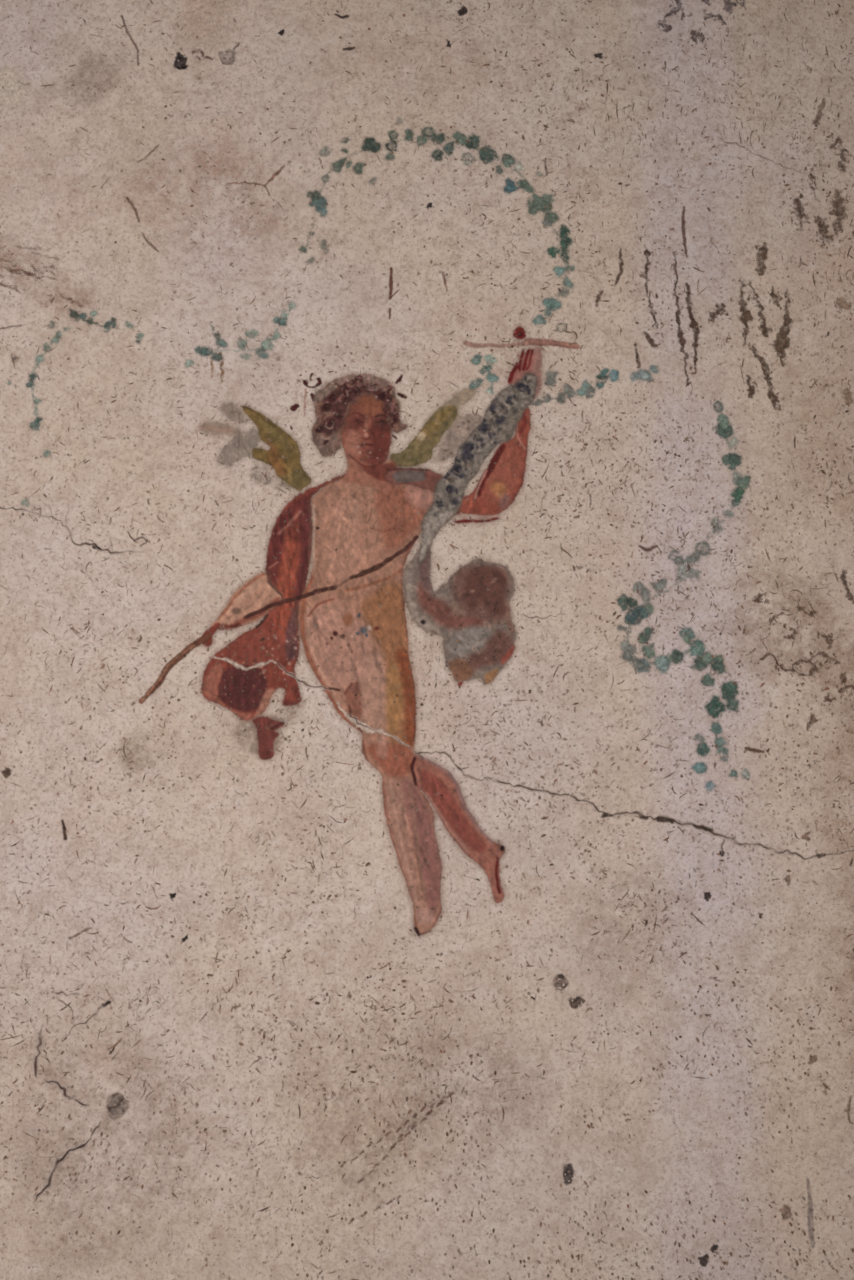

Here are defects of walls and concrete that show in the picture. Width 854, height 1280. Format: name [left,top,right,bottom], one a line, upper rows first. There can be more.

crack [0,507,148,555]
crack [213,657,854,860]
crack [32,991,111,1199]